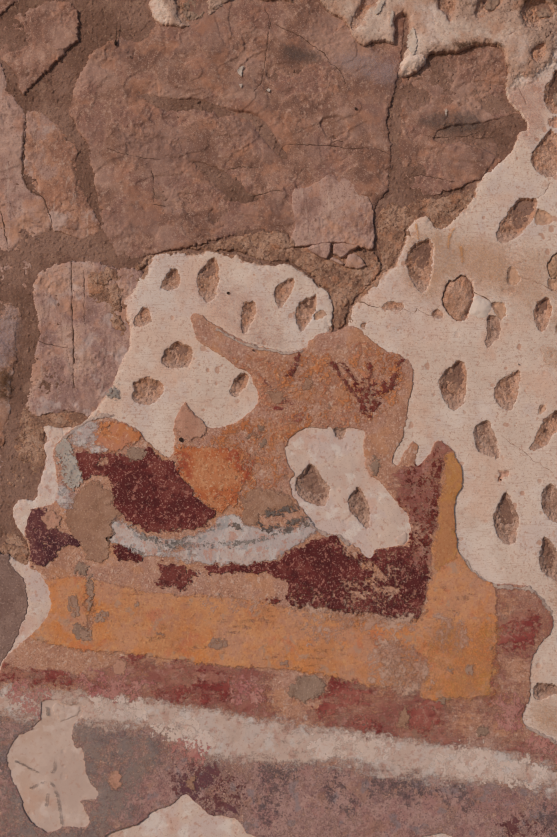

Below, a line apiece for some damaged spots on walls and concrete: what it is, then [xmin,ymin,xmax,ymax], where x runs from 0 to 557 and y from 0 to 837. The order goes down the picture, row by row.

hole [350,0,378,30]
hole [438,0,456,22]
hole [496,198,553,243]
spalling [88,181,480,336]
crack [39,263,85,386]
hole [439,360,467,411]
hole [493,492,519,545]
peeling [0,425,63,670]
peeling [105,794,254,837]